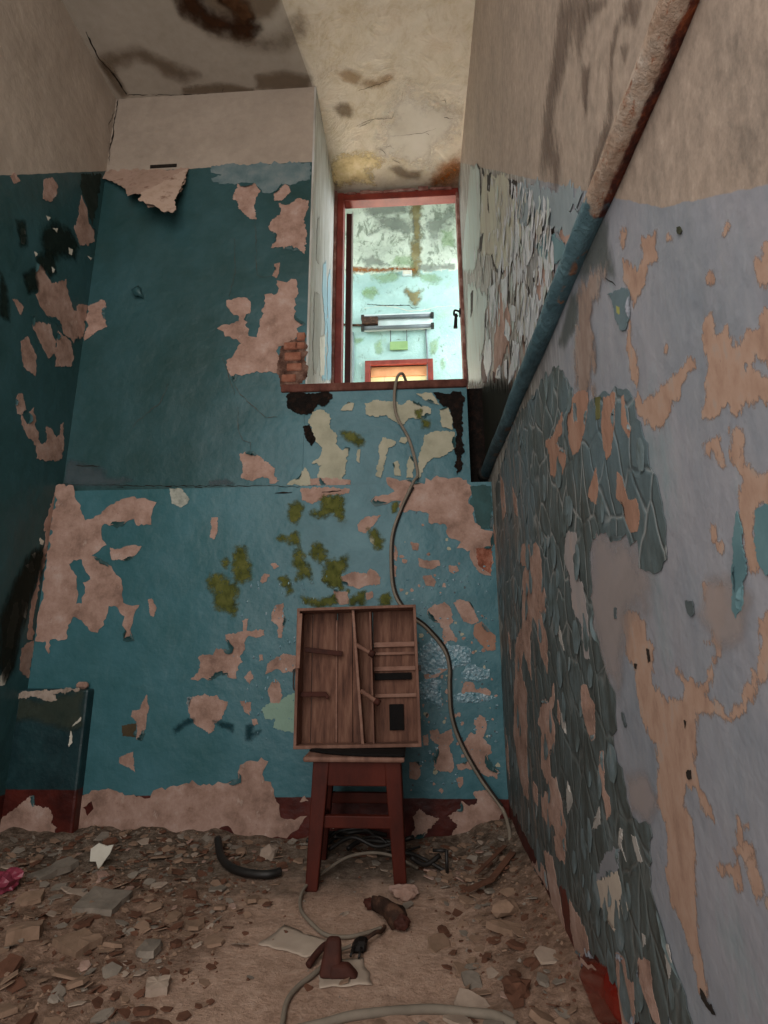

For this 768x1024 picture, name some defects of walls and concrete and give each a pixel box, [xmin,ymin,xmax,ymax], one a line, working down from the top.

crack [86,33,197,160]
leakage [103,52,309,95]
leakage [175,0,278,41]
peeling [0,172,107,376]
peeling [217,183,332,387]
peeling [462,163,583,387]
peeling [19,484,157,678]
mould [206,546,252,617]
mould [277,495,366,608]
mould [366,528,385,550]
peeling [239,226,768,1024]
peeling [78,758,307,838]